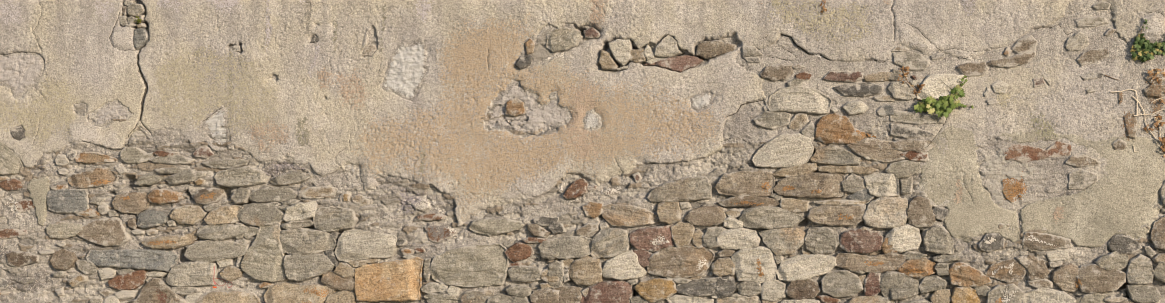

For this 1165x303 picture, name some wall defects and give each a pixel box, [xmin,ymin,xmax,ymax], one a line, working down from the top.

crack [870,1,986,63]
spalling [0,54,43,96]
crack [109,12,151,147]
spalling [205,110,227,145]
spalling [384,44,425,98]
spalling [489,84,567,132]
spalling [693,94,711,109]
spalling [985,148,1035,206]